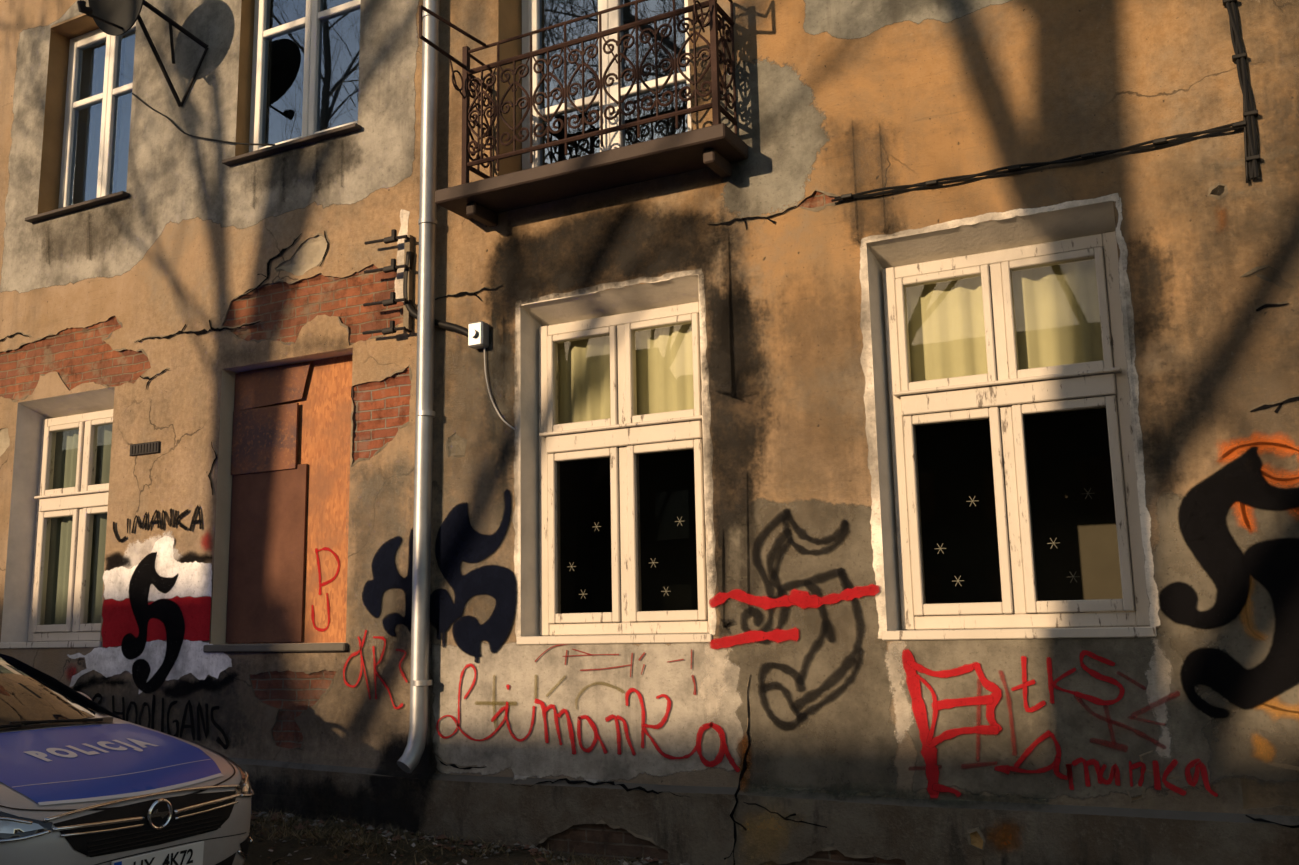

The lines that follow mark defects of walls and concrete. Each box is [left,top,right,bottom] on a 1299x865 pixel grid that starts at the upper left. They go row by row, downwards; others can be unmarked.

spalling [797,189,843,212]
crack [134,230,330,389]
spalling [222,233,403,346]
damp [433,205,769,591]
damp [433,562,496,623]
crack [428,749,486,769]
crack [512,778,688,797]
crack [724,675,827,865]
spalling [535,820,670,864]